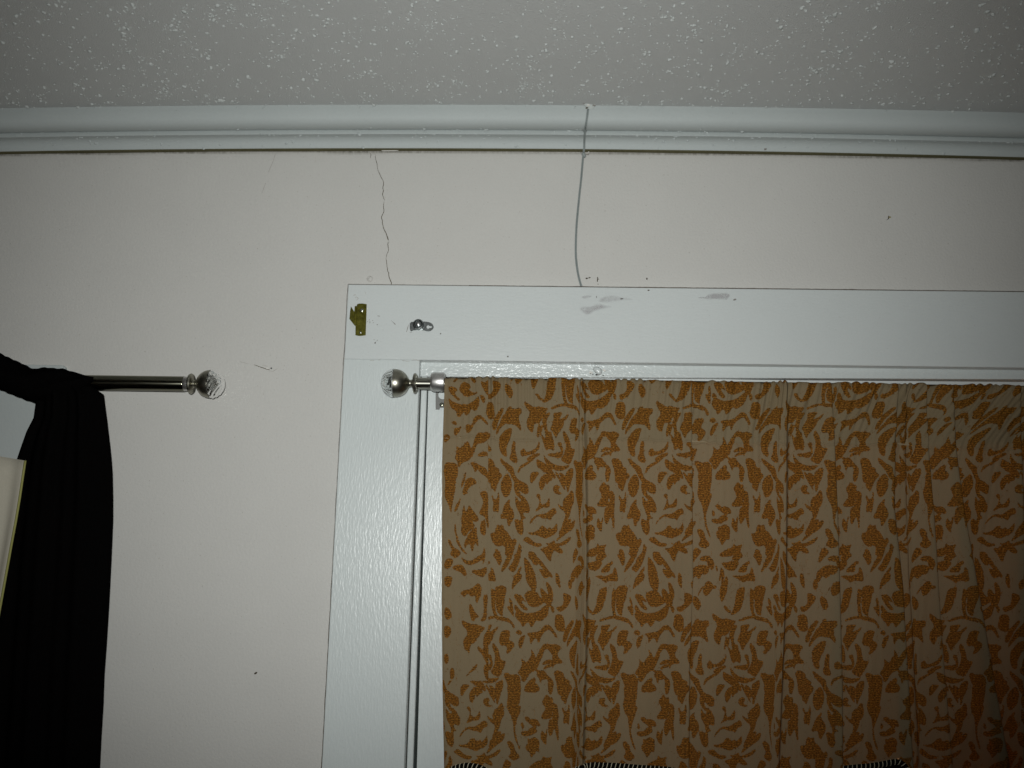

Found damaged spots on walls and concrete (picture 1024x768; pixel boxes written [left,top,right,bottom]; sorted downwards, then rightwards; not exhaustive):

crack [321,156,410,768]
crack [447,284,1024,292]